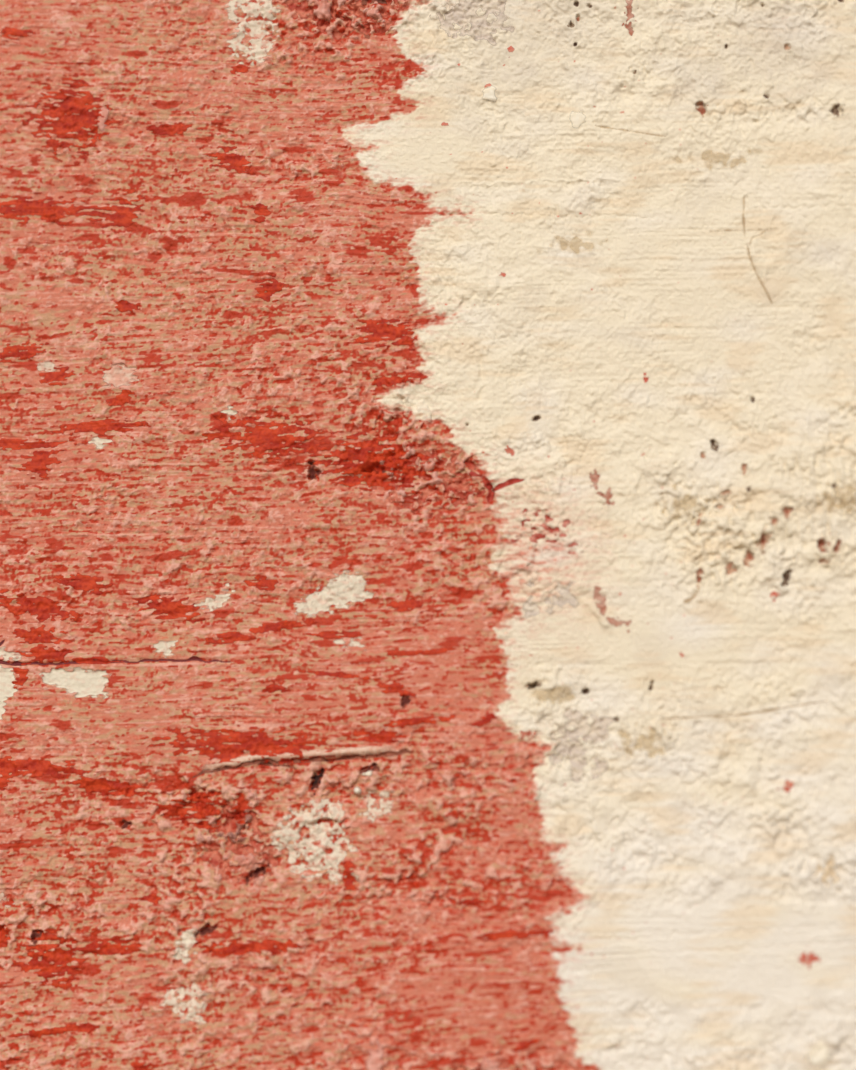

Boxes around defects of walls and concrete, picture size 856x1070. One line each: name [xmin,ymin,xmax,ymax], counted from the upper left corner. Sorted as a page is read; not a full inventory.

peeling [225,0,407,66]
spalling [436,0,514,46]
peeling [294,570,374,617]
crack [0,640,82,666]
crack [111,655,231,663]
peeling [0,647,27,720]
peeling [39,667,109,698]
crack [192,746,413,779]